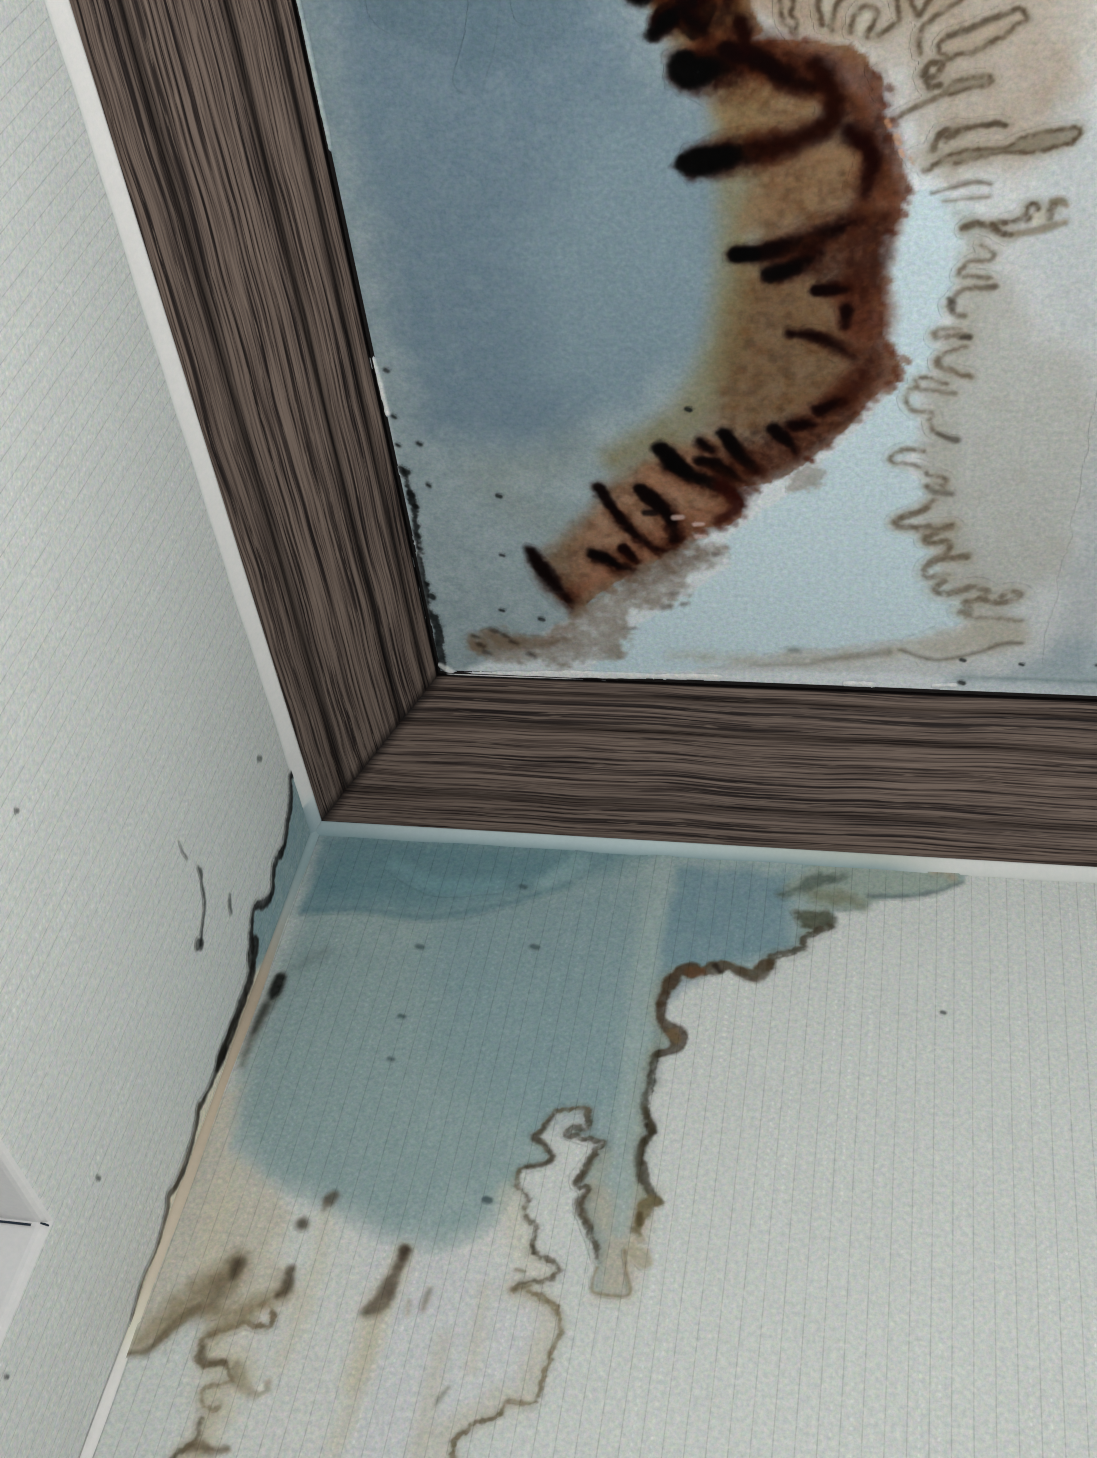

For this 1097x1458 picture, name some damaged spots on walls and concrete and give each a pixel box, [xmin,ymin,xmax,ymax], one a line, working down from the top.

water stain [301,0,735,671]
water stain [663,0,1097,696]
crack [179,840,233,953]
water stain [126,771,970,1458]